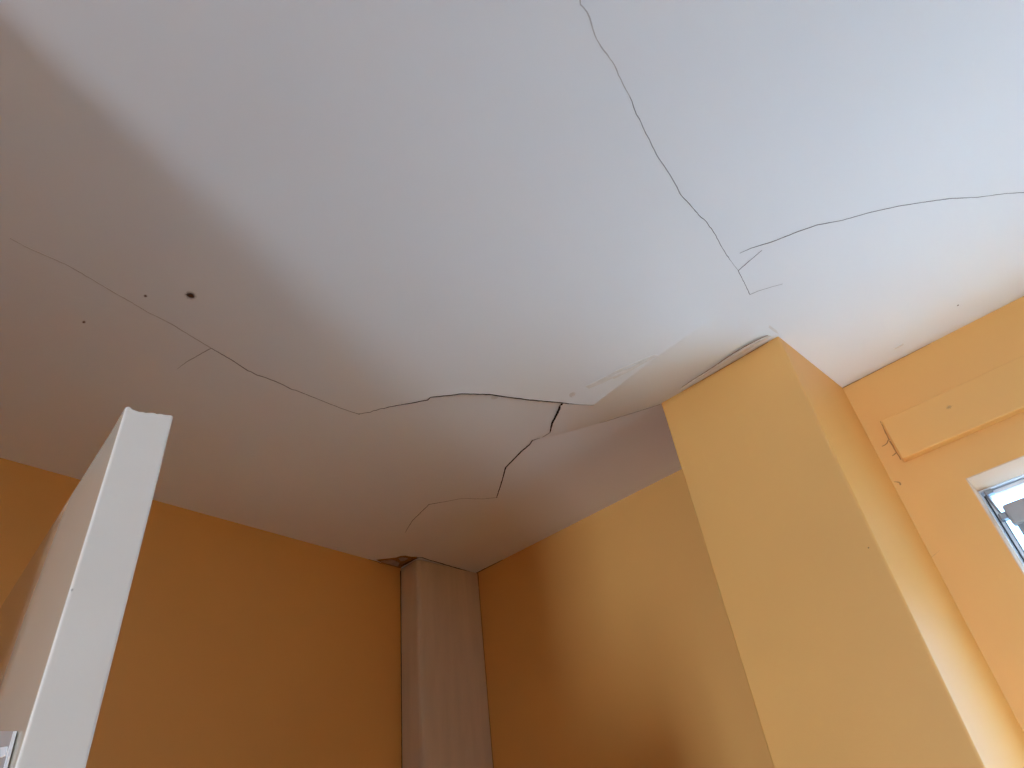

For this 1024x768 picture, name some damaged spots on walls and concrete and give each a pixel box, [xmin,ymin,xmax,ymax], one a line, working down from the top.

crack [580,0,1024,295]
crack [10,238,579,531]